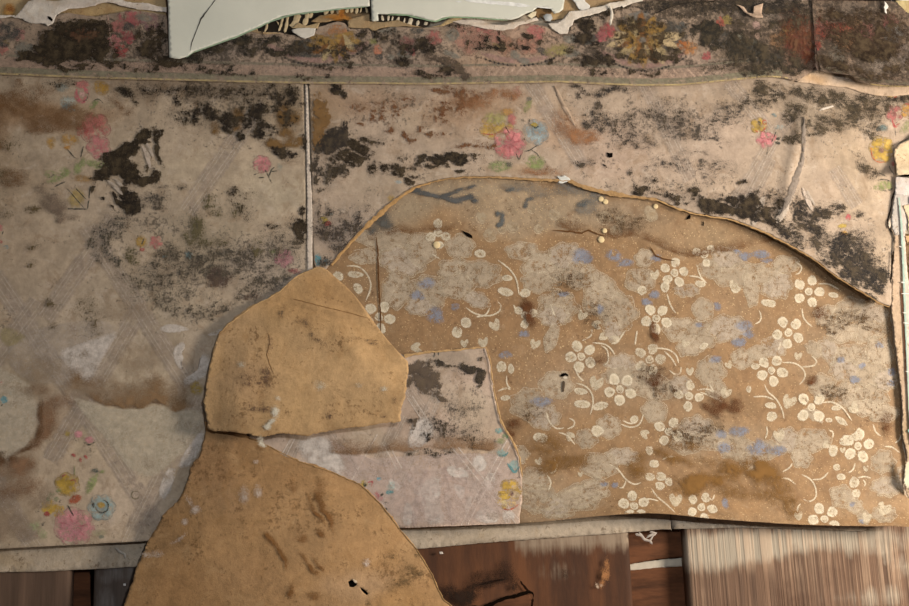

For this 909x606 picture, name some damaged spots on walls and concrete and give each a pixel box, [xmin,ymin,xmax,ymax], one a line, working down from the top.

flaking render [292,28,316,39]
flaking render [573,0,590,10]
water stain [0,7,548,339]
water stain [498,0,909,335]
water stain [0,342,200,544]
water stain [329,350,498,459]
water stain [632,365,683,401]
water stain [805,374,851,401]